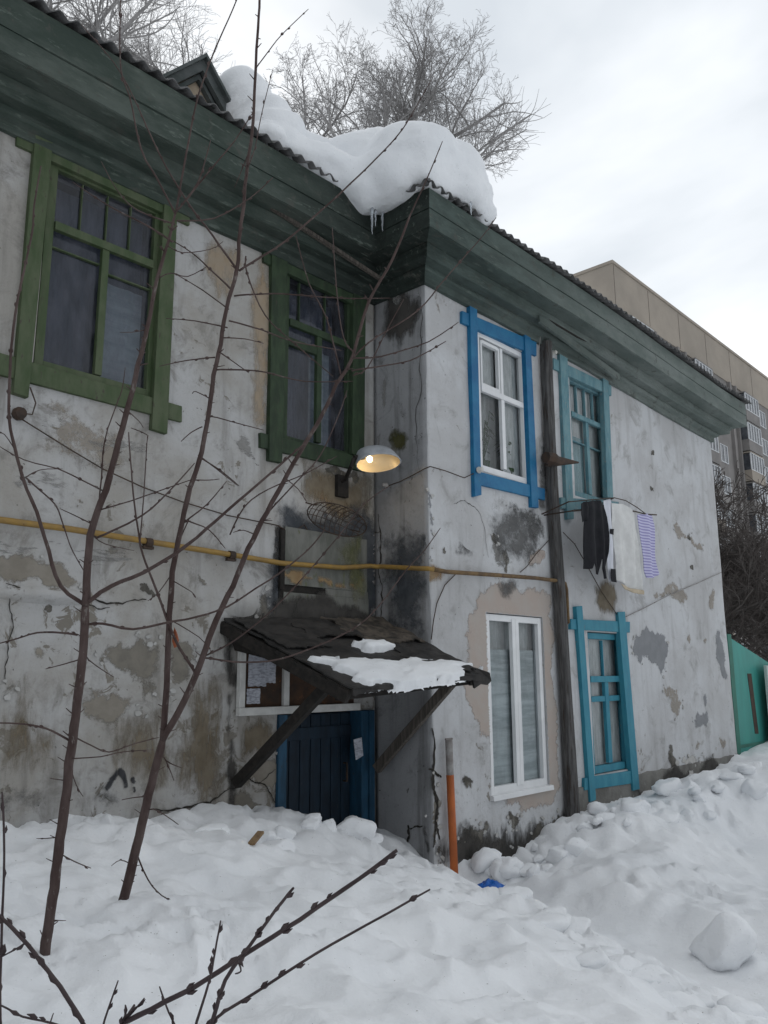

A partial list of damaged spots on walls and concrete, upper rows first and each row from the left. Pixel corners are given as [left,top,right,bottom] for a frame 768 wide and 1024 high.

damp [383,293,421,342]
spalling [0,554,83,589]
damp [388,535,426,633]
peeling [493,541,509,566]
spalling [83,631,201,726]
damp [179,637,272,805]
peeling [463,582,560,812]
spalling [631,627,684,721]
damp [423,808,565,863]